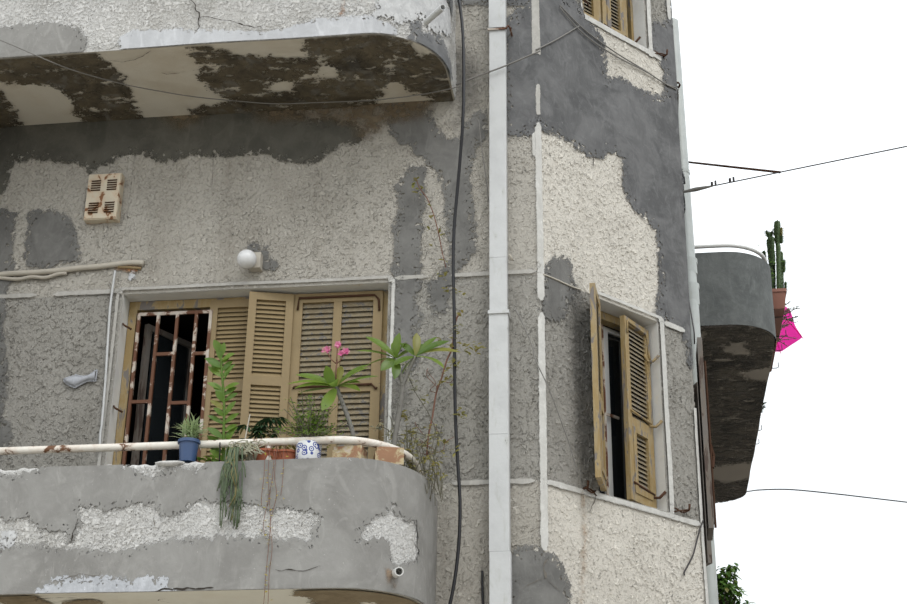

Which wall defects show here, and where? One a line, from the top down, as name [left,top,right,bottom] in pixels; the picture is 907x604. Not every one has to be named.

flaking render [0,54,144,128]
flaking render [118,0,453,116]
flaking render [701,326,775,468]
flaking render [714,478,749,503]
peeling [0,574,176,604]
flaking render [289,590,418,604]